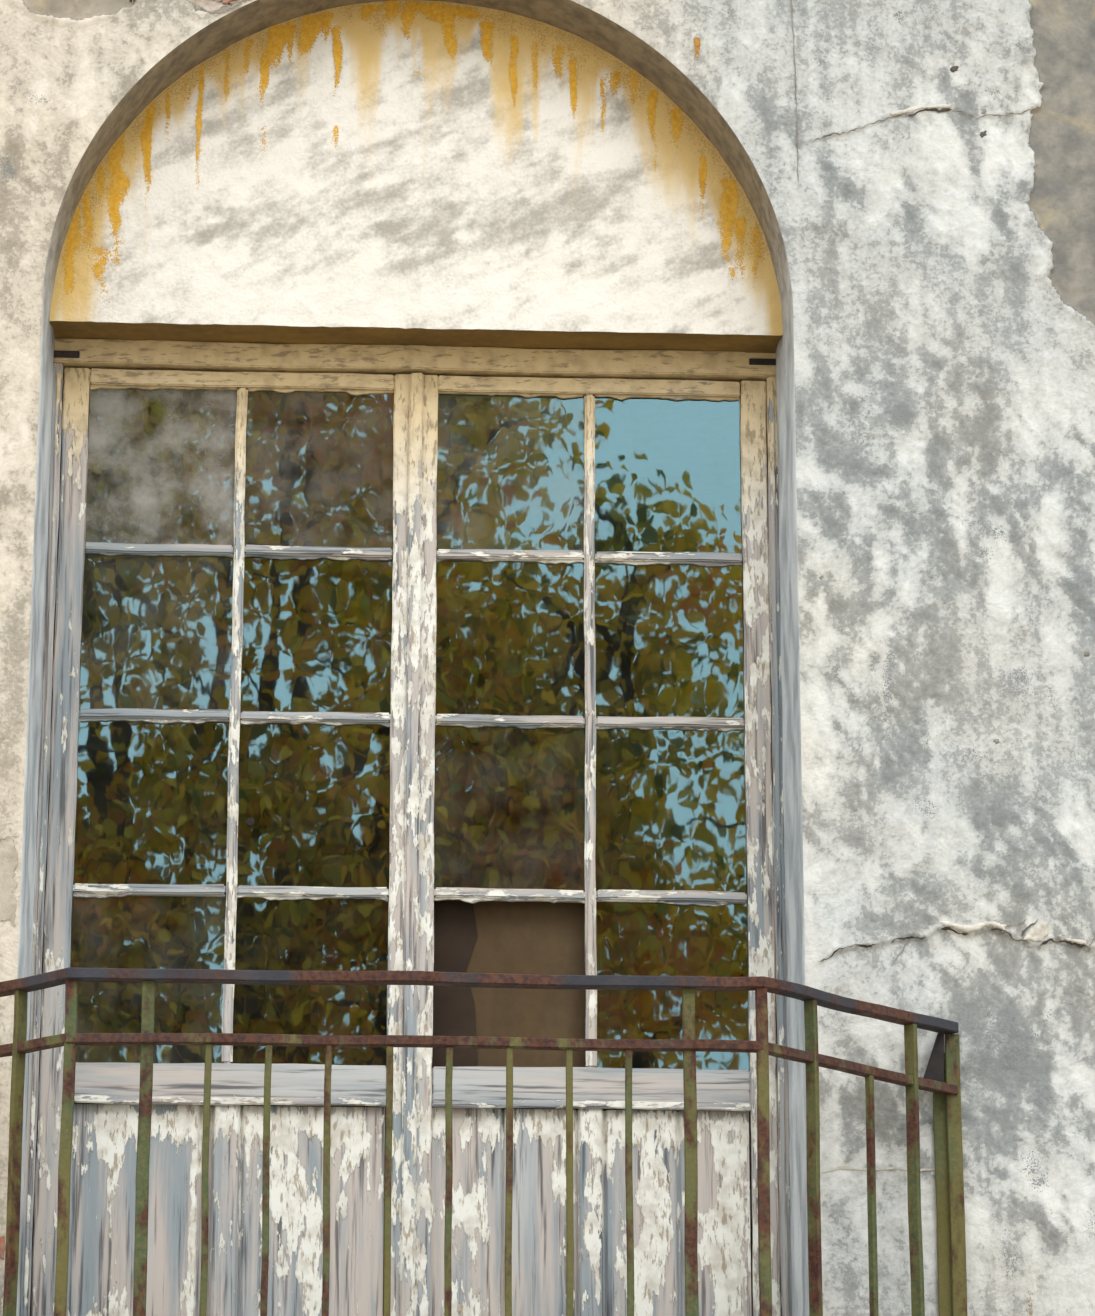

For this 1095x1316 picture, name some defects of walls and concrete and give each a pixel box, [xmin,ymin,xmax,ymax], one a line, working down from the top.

peeling [23,0,134,20]
flaking render [187,0,247,14]
crack [791,0,1032,189]
leakage [61,0,770,317]
peeling [1028,0,1095,325]
peeling [0,836,18,927]
crack [820,920,1095,966]